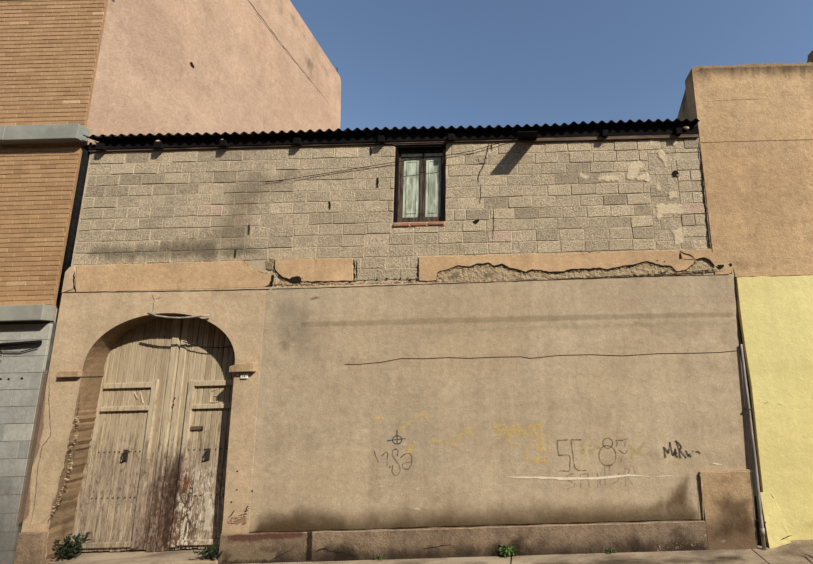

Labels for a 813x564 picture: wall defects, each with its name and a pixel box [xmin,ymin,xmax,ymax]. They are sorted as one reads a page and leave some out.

crack [58,143,742,362]
flaking render [234,249,732,287]